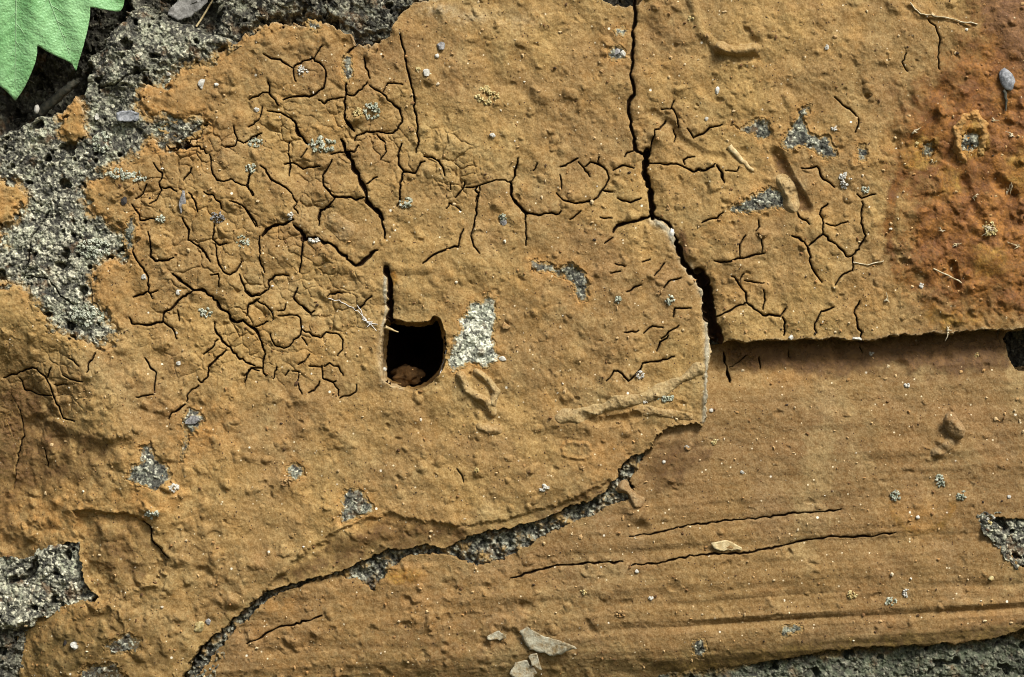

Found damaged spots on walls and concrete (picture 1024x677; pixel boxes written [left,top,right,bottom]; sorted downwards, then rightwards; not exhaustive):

peeling [116,110,139,122]
spalling [731,103,838,161]
crack [130,0,789,418]
spalling [727,186,785,215]
spalling [529,259,591,303]
crack [792,166,874,352]
spalling [444,292,501,373]
spalling [126,407,205,491]
spalling [339,487,376,524]
crack [512,509,892,578]
crack [248,615,322,643]